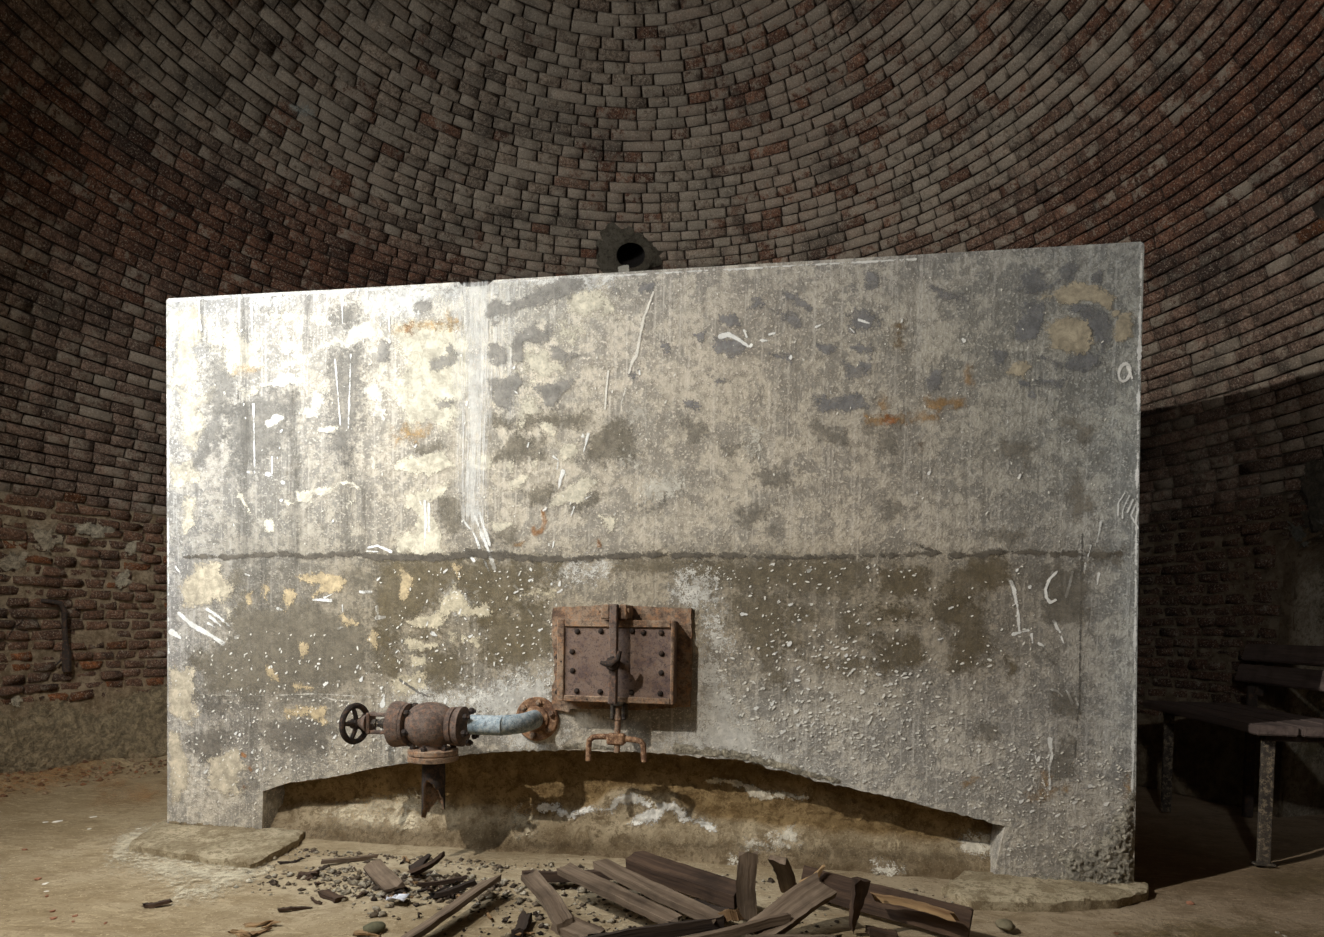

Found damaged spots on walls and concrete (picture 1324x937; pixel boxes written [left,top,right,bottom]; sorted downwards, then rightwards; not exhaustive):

peeling [0,520,64,571]
peeling [115,539,142,592]
damp [167,394,180,595]
damp [489,354,692,512]
damp [680,418,707,444]
damp [721,423,792,535]
damp [186,492,1027,781]
damp [1012,608,1044,647]
damp [1038,476,1139,793]
damp [1024,735,1075,790]